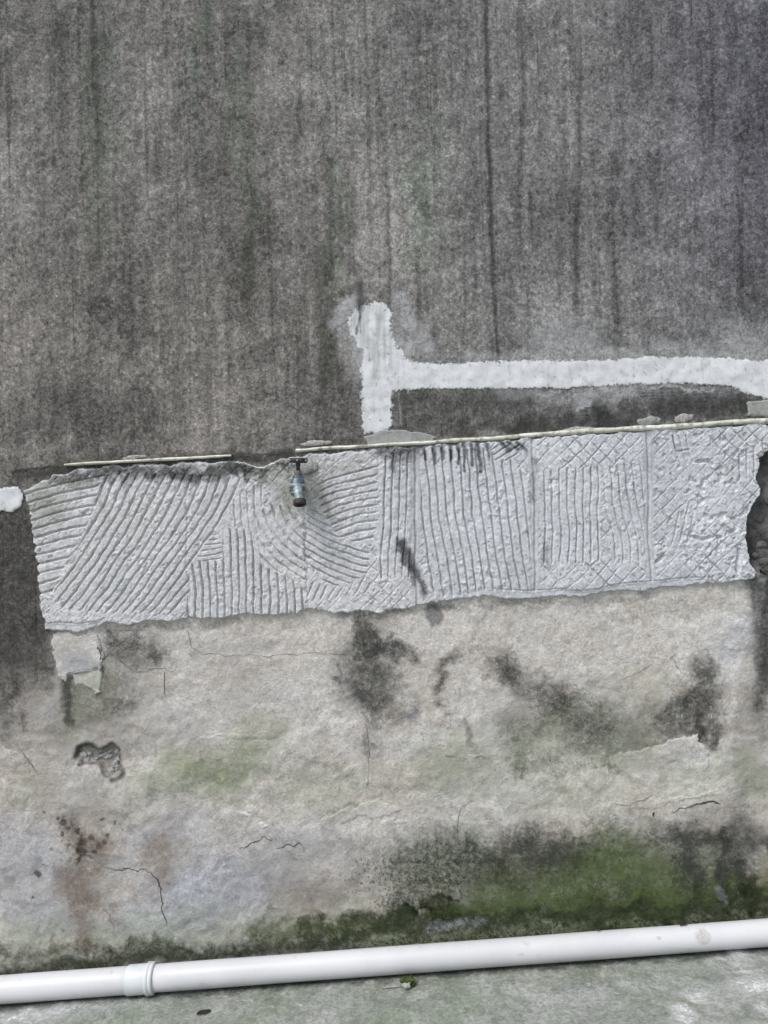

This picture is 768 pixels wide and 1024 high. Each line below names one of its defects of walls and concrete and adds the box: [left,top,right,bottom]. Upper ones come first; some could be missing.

water stain [379,425,490,473]
water stain [500,397,748,451]
water stain [397,540,426,594]
peeling [51,630,105,695]
water stain [347,624,418,713]
water stain [667,658,721,746]
spalling [73,743,124,781]
water stain [43,811,108,853]
crack [614,796,720,817]
crack [98,863,167,926]
water stain [248,817,768,939]